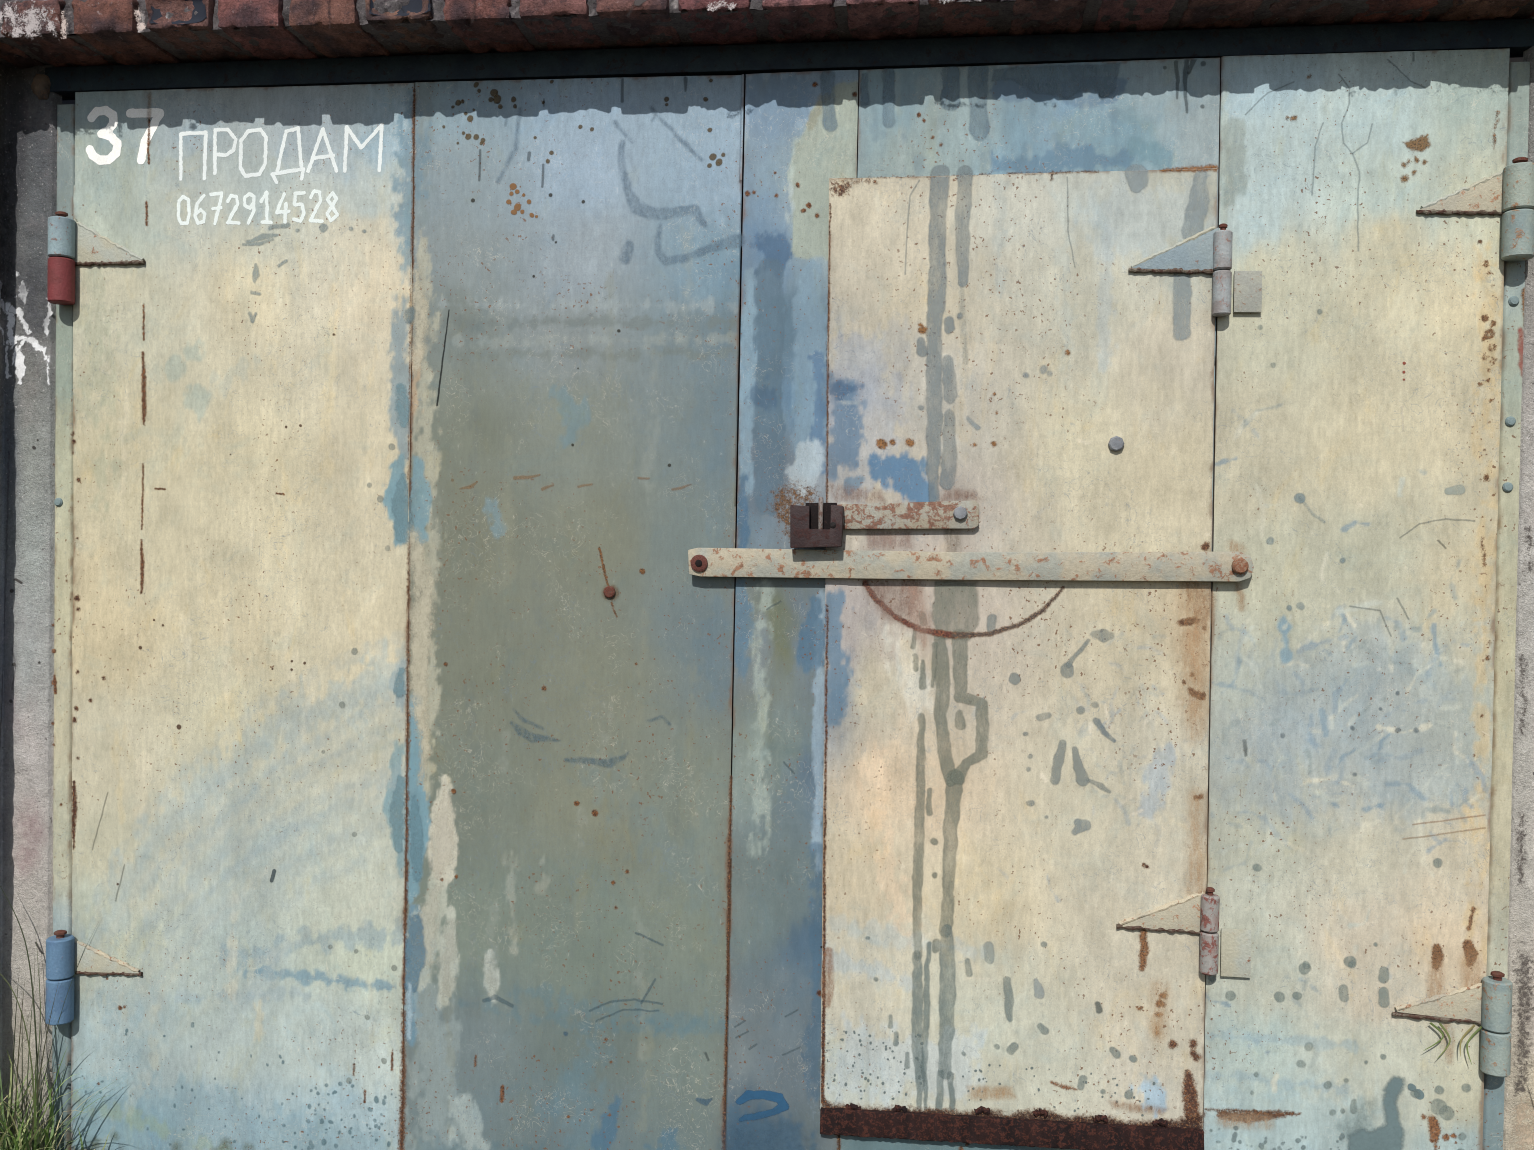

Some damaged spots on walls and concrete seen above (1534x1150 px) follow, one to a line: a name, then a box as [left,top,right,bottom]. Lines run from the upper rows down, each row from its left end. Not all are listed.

rust [451,82,517,145]
rust [707,153,725,168]
rust [1401,134,1430,182]
rust [506,183,538,218]
peeling [406,270,427,370]
peeling [390,474,454,1039]
rust [817,605,1300,1130]
rust [1431,944,1444,987]
rust [1462,906,1479,977]